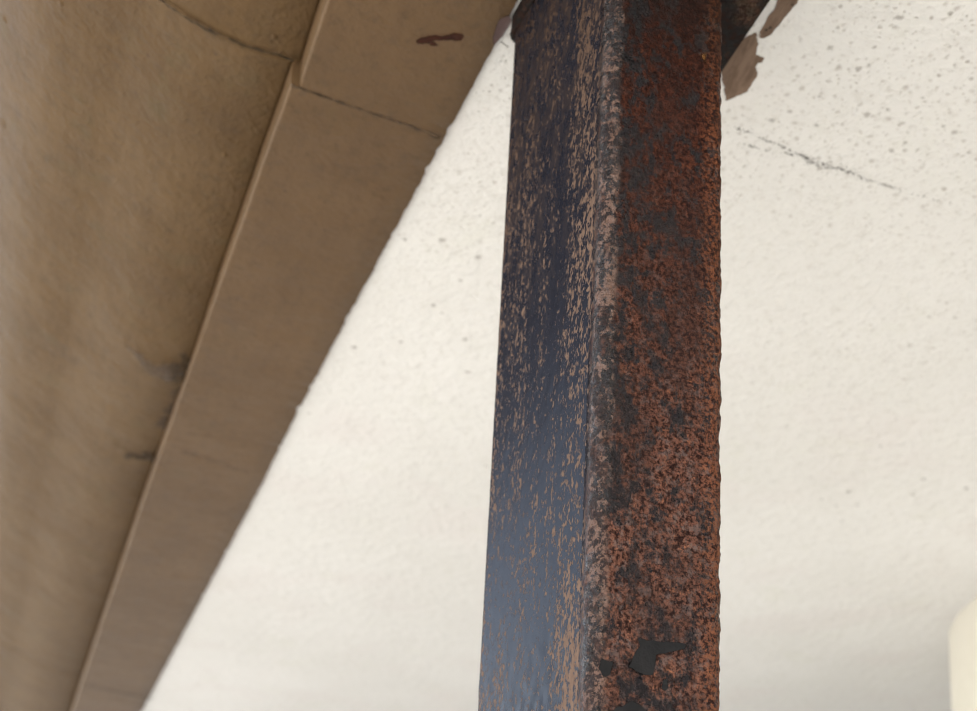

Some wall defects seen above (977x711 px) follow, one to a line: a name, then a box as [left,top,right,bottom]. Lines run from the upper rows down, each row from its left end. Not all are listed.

rust [493,16,512,44]
crack [737,127,951,205]